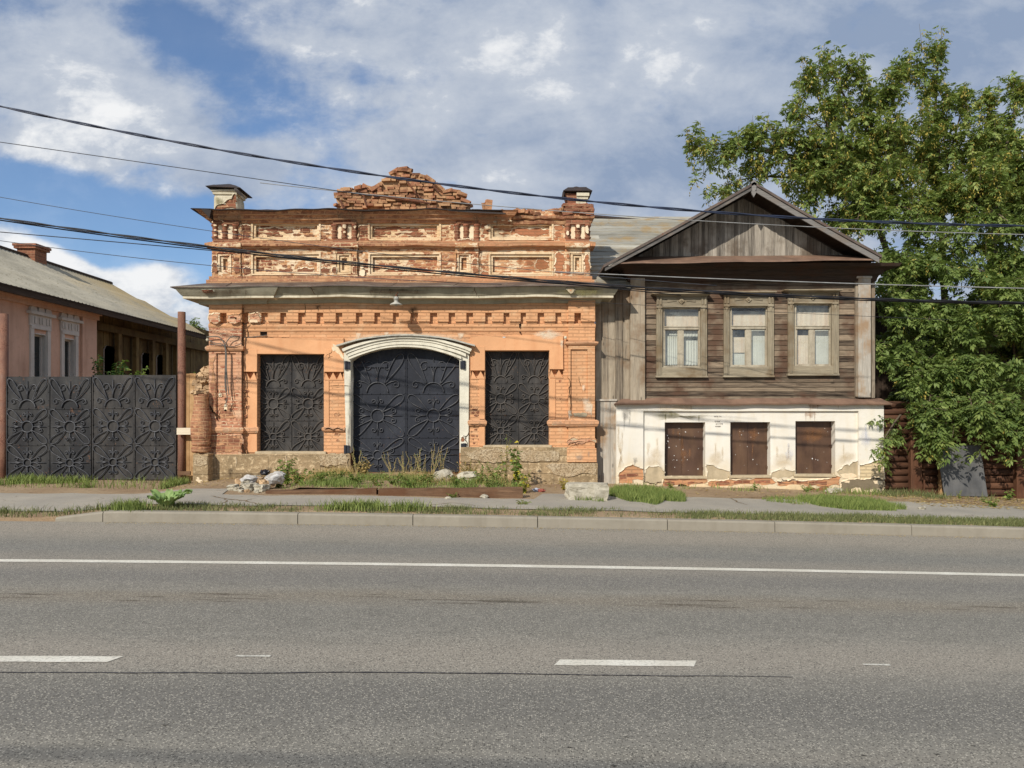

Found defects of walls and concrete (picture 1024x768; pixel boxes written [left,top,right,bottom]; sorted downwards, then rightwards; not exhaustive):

peeling [343,220,570,276]
spalling [617,459,885,492]